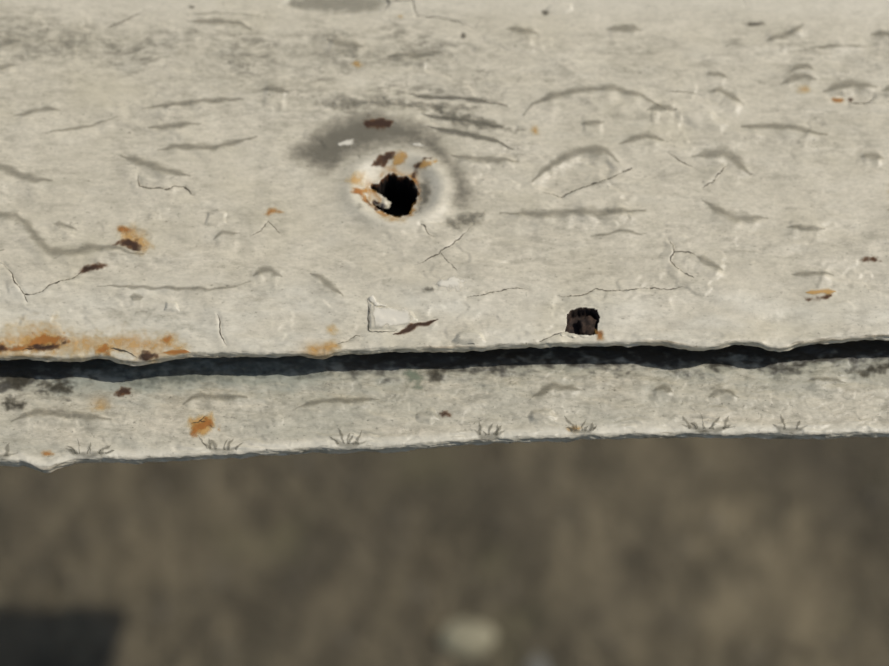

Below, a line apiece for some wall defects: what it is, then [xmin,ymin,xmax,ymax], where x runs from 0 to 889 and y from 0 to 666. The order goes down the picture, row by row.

leakage [422,113,512,149]
crack [138,176,191,194]
corrosion [115,226,145,251]
crack [419,224,469,270]
crack [2,263,87,302]
corrosion [0,330,189,361]
leakage [429,369,442,381]
leakage [850,363,889,377]
leakage [2,374,73,411]
corrosion [189,415,213,436]